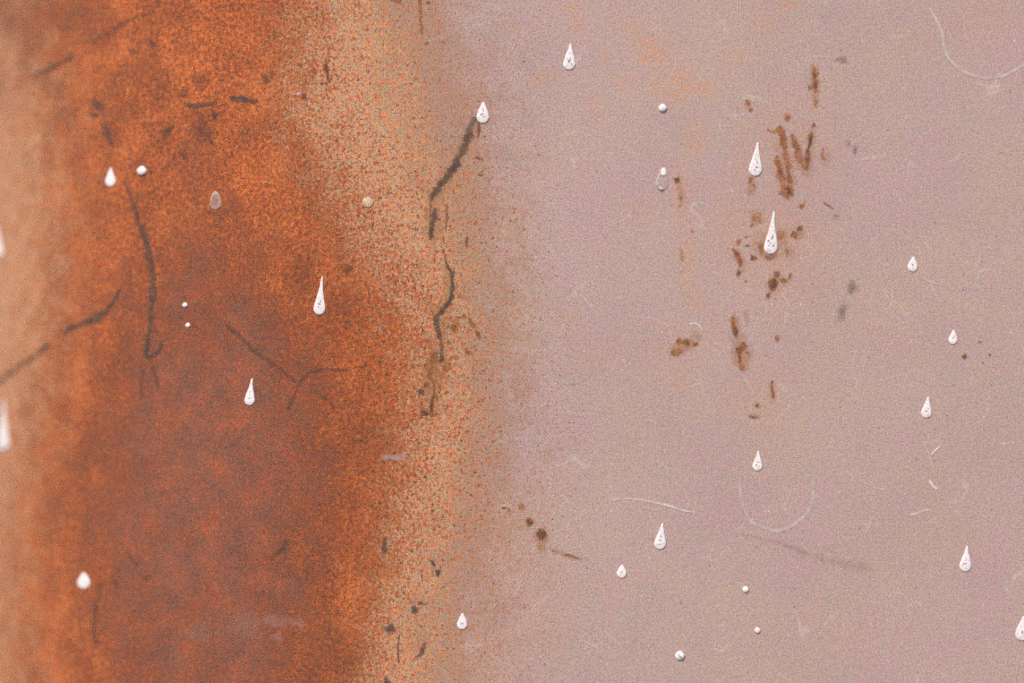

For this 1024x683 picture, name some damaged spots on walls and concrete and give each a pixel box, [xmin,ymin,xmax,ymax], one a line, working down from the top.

crack [429,118,481,239]
rust [768,114,815,198]
crack [134,212,162,359]
rust [0,0,578,683]
crack [416,261,461,418]
rust [671,339,698,355]
rust [731,316,749,370]
rust [732,214,788,275]